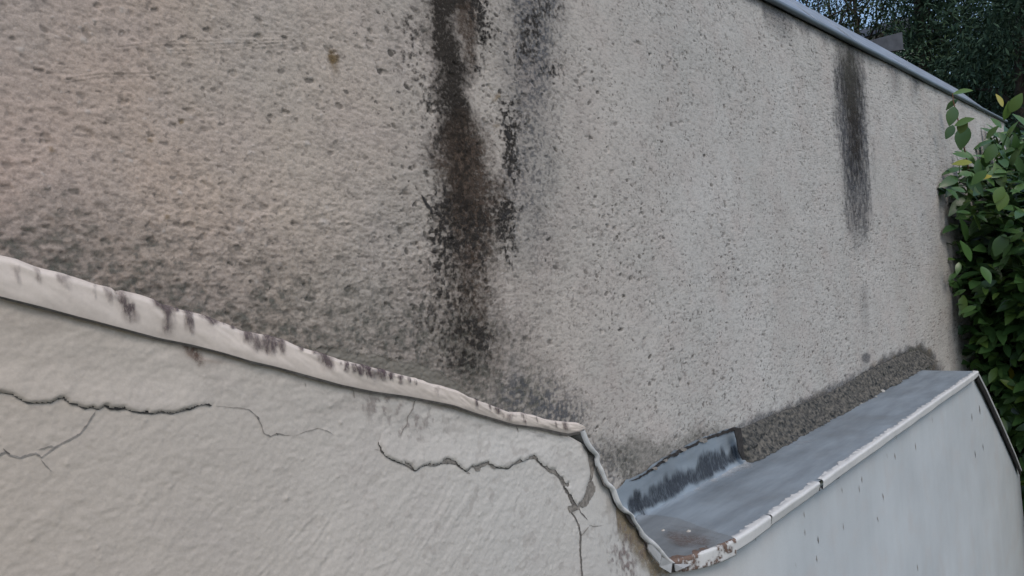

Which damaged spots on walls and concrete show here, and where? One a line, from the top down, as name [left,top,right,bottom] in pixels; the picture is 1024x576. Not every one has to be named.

water stain [824,32,870,228]
water stain [0,238,28,259]
water stain [25,0,583,428]
water stain [863,346,941,371]
crack [0,392,332,471]
crack [375,400,602,576]
rust [665,534,736,572]